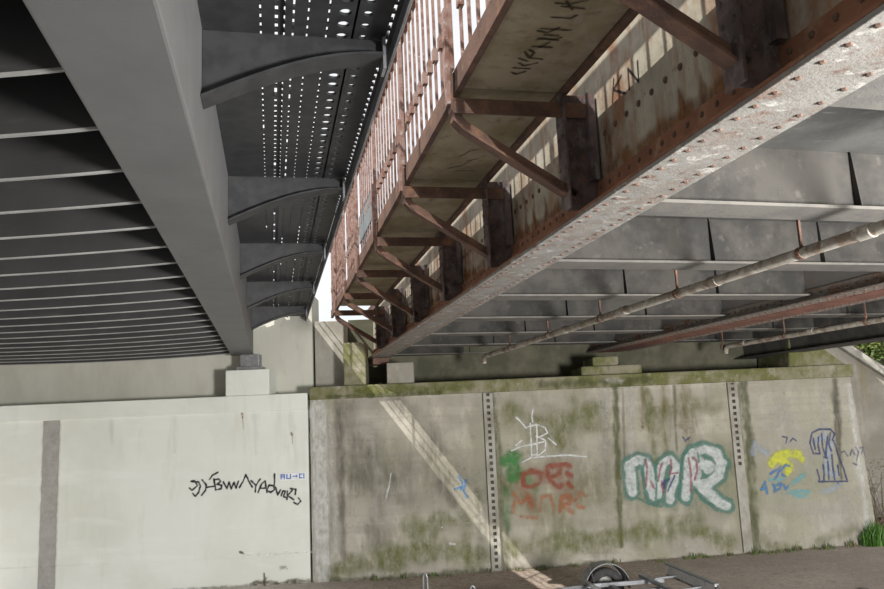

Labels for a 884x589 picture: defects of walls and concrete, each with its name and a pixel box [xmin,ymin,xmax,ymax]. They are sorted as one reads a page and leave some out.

corrosion [605,78,724,170]
water stain [602,387,631,515]
water stain [745,413,753,462]
water stain [826,380,842,479]
water stain [749,481,758,551]